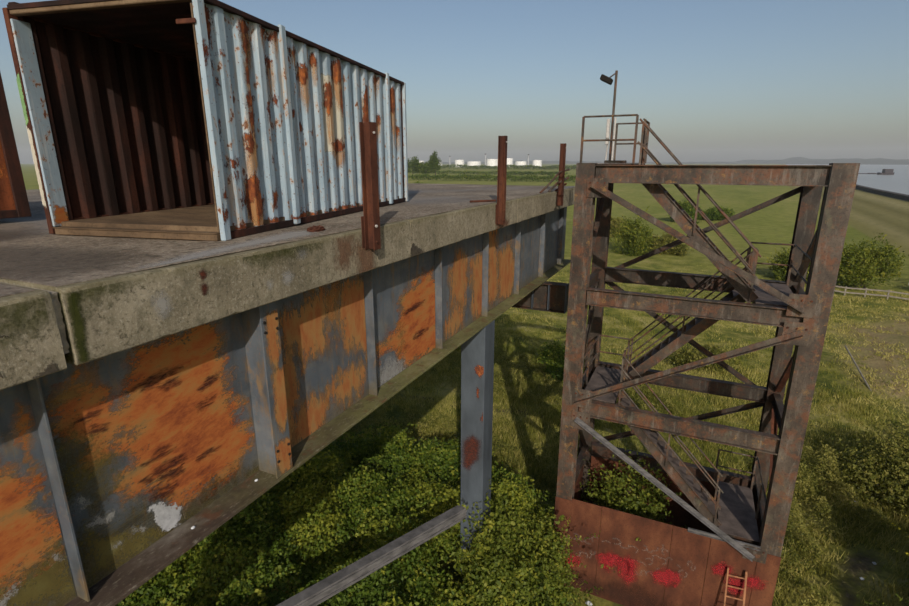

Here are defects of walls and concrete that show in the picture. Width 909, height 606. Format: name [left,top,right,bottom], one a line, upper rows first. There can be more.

corrosion [203,4,225,87]
corrosion [222,18,345,230]
corrosion [0,403,62,591]
water stain [0,539,75,606]
corrosion [46,322,255,510]
water stain [54,424,259,587]
corrosion [265,229,515,474]